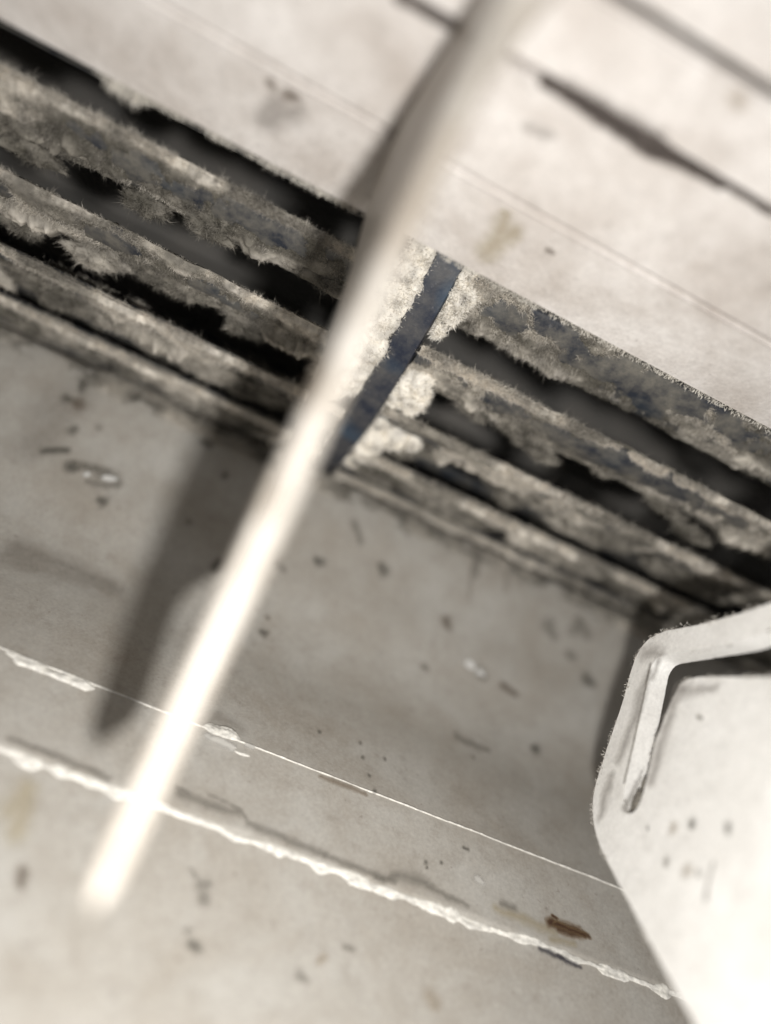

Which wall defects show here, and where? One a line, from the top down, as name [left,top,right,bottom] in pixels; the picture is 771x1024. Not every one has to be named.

rust [546,914,591,939]